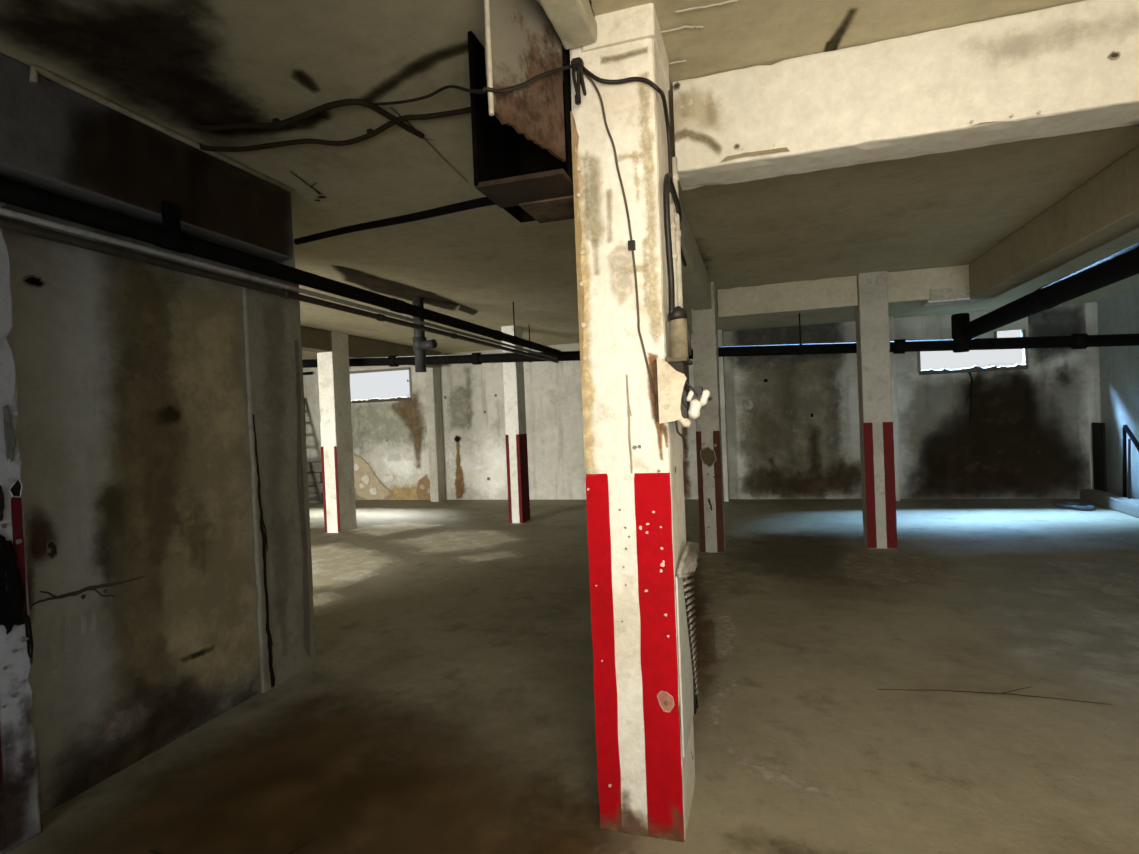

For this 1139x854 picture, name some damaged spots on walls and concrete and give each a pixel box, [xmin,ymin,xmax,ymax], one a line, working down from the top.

water stain [0,0,257,141]
crack [29,576,146,608]
water stain [49,245,261,810]
crack [252,414,275,688]
spalling [353,453,394,500]
spalling [415,474,431,500]
rust [455,443,465,498]
water stain [745,416,861,499]
water stain [910,376,1089,499]